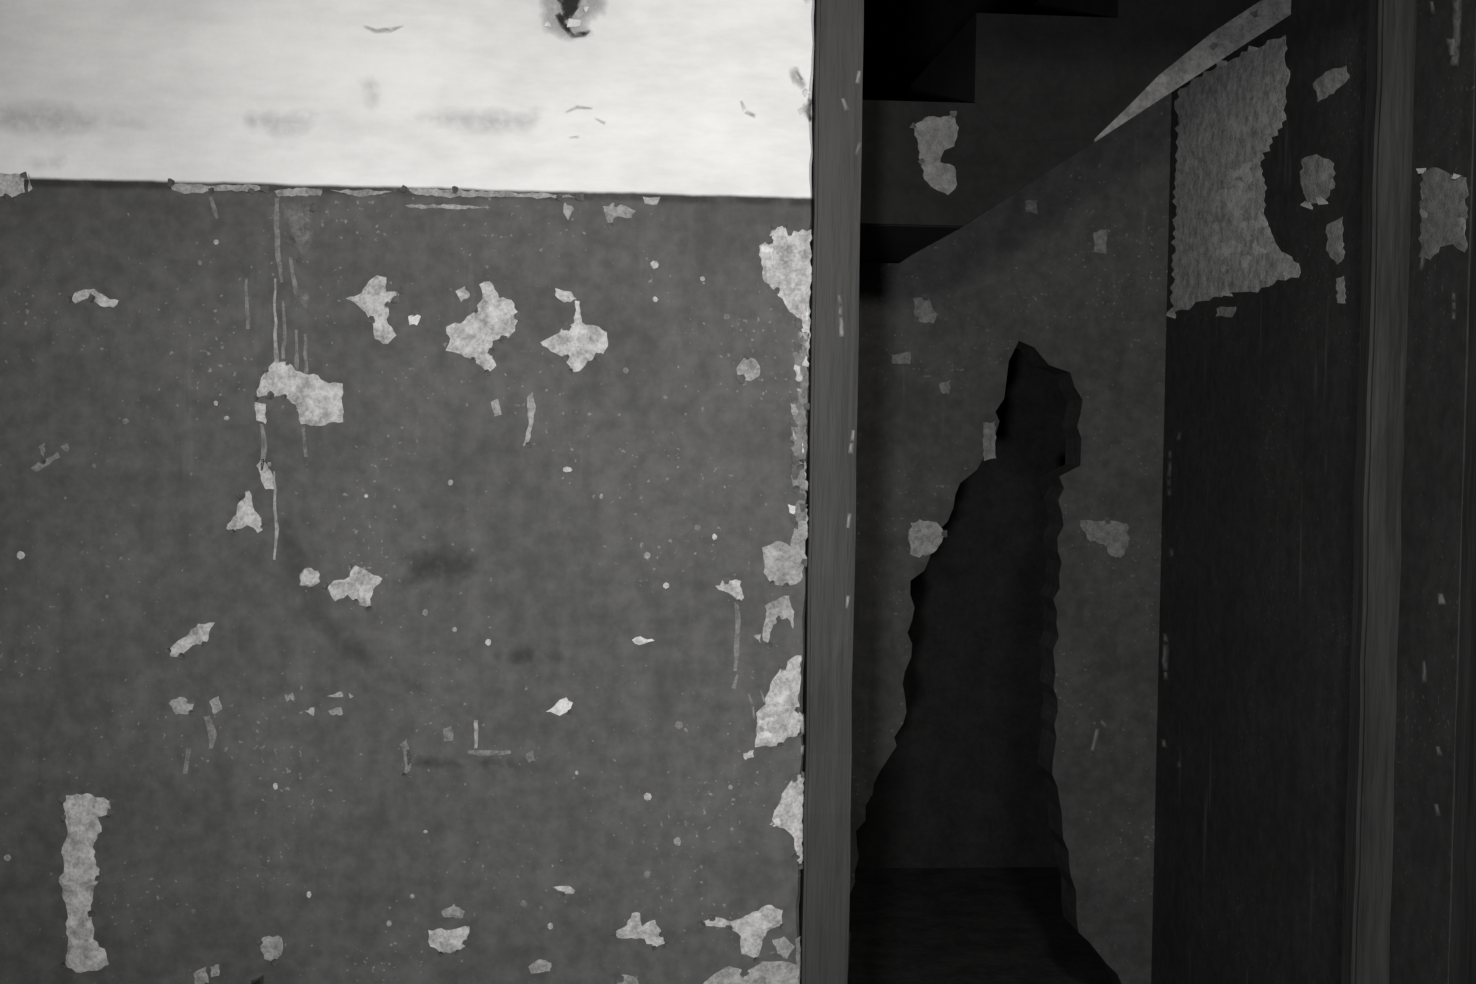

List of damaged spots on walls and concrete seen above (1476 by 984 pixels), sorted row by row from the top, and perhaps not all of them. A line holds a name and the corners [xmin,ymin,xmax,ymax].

peeling [910,111,959,195]
peeling [1166,35,1300,318]
peeling [1300,154,1335,209]
peeling [167,178,584,560]
peeling [541,288,608,374]
spalling [716,222,812,760]
peeling [300,562,382,612]
spalling [770,771,804,870]
peeling [57,793,116,973]
peeling [428,904,471,956]
peeling [611,912,670,951]
peeling [697,905,801,984]